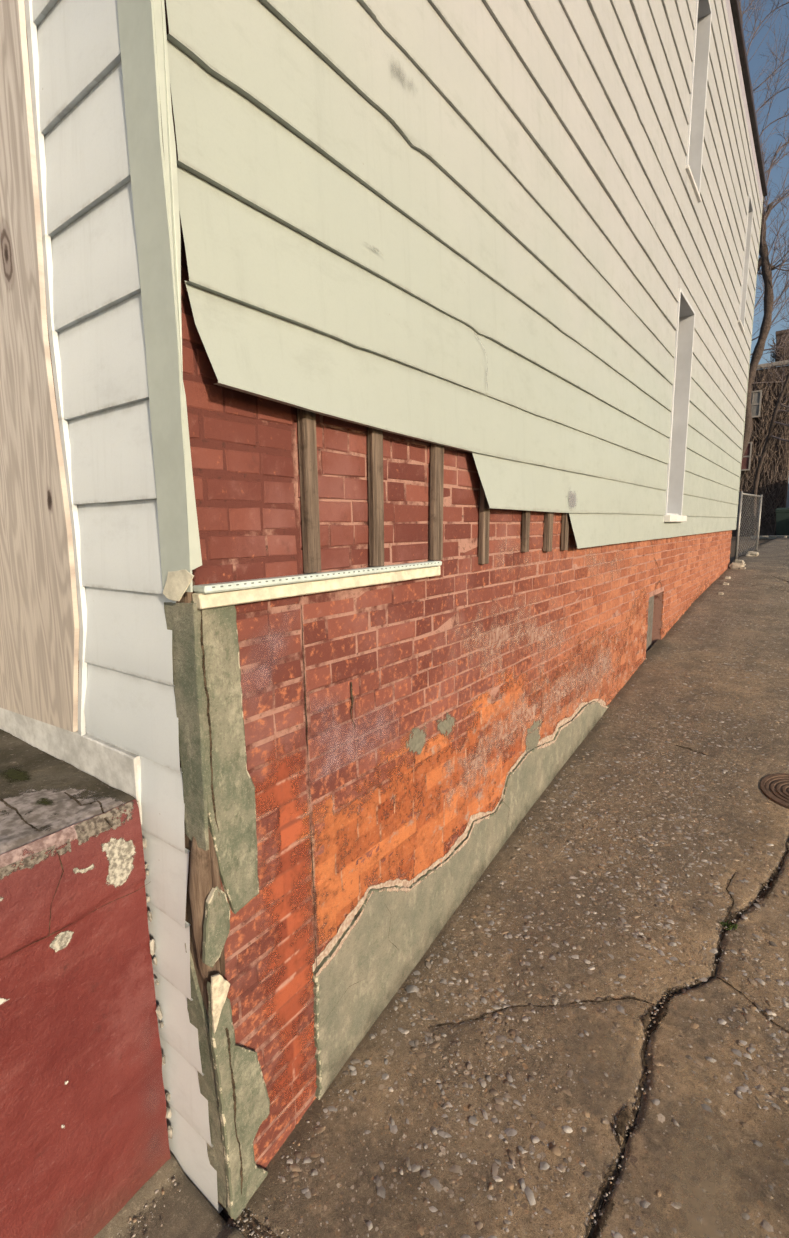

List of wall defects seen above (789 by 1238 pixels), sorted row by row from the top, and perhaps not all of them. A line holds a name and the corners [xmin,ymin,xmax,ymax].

spalling [50,931,74,952]
peeling [0,788,136,888]
peeling [164,580,710,1220]
crack [427,842,789,1238]